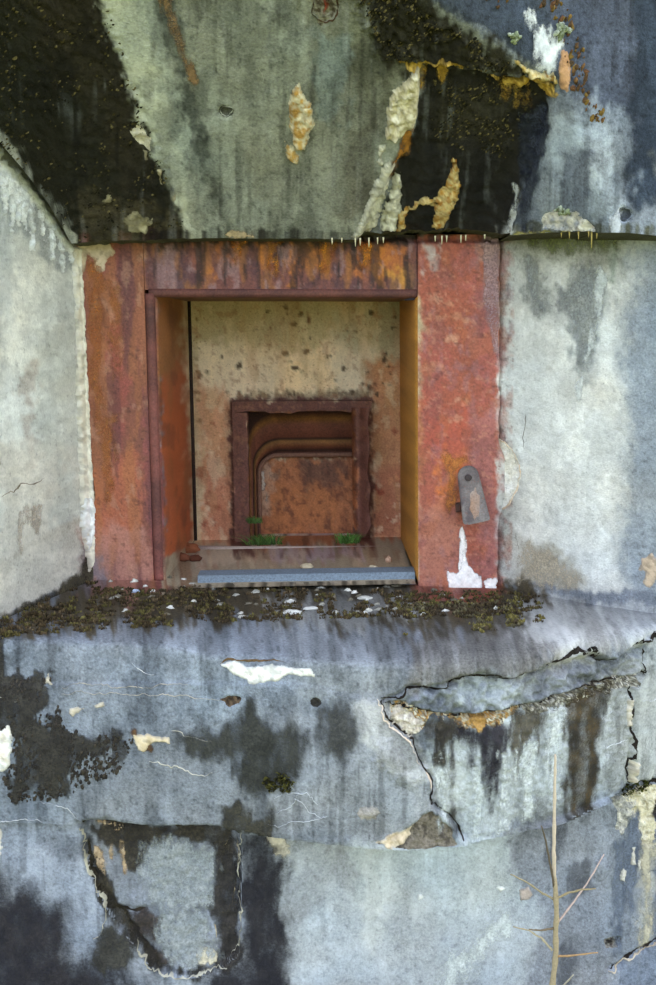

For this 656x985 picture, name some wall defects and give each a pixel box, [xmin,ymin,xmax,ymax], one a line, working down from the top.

leakage [0,145,75,273]
rust [470,487,480,520]
rust [180,542,202,562]
leakage [8,558,94,617]
flaking render [0,725,14,772]
leakage [0,634,134,805]
spalling [389,674,641,737]
leakage [0,697,357,985]
spalling [375,811,457,850]
spalling [611,759,656,846]
leakage [611,812,643,952]
crack [609,938,656,974]